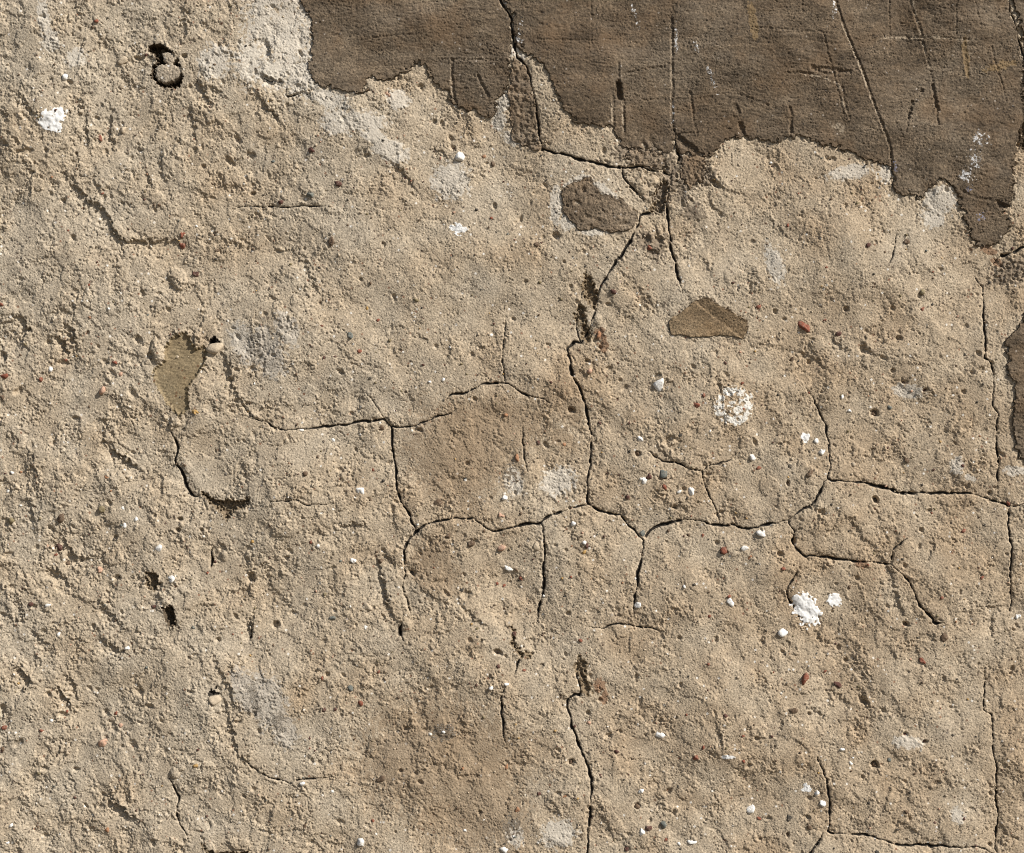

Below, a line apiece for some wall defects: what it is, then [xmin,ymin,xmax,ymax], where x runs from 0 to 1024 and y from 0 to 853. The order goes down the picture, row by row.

flaking render [301,0,1024,296]
crack [238,0,1024,641]
crack [168,424,204,497]
crack [169,778,186,833]
crack [248,763,331,783]
crack [500,656,522,741]
crack [566,663,593,853]
crack [810,675,999,853]